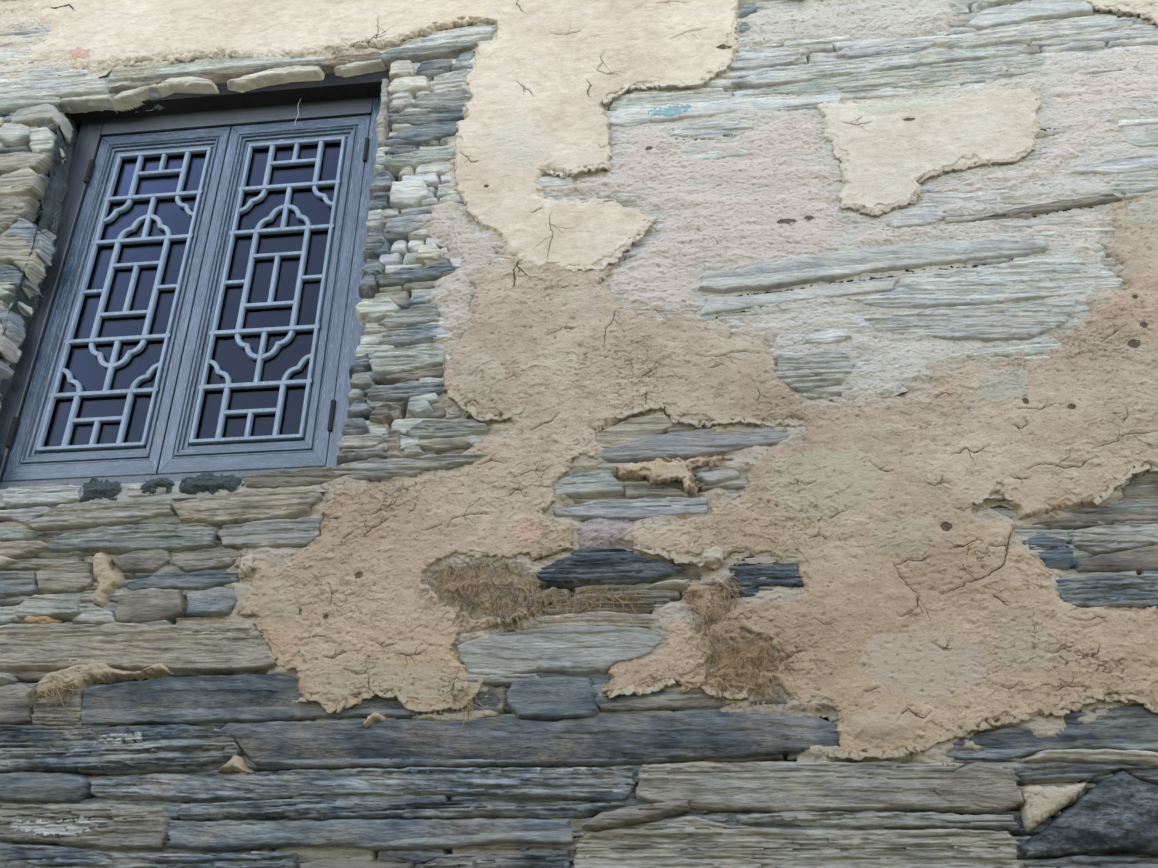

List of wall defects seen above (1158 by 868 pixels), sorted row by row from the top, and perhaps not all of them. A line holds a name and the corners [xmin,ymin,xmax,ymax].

spalling [0,0,233,81]
spalling [603,0,963,108]
crack [512,207,573,287]
spalling [282,22,1158,764]
spalling [222,546,313,637]